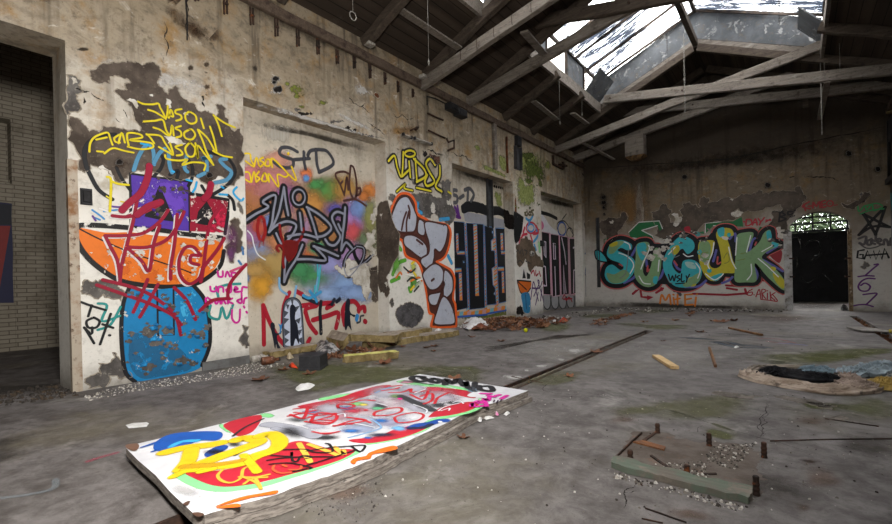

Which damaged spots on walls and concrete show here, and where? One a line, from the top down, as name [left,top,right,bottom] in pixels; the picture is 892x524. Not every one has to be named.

flaking render [62,59,245,217]
flaking render [81,279,144,301]
peeling [122,237,162,275]
flaking render [154,200,245,281]
flaking render [642,182,807,261]
peeling [84,292,212,389]